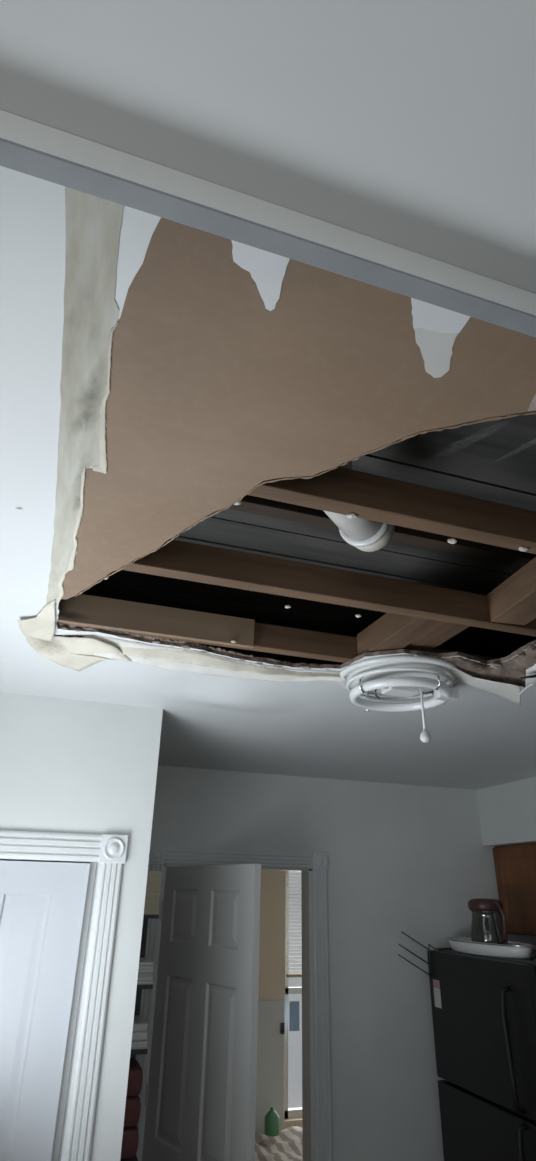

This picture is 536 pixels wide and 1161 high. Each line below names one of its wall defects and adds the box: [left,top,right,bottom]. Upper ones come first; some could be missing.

peeling [18,217,536,683]
peeling [435,663,534,705]